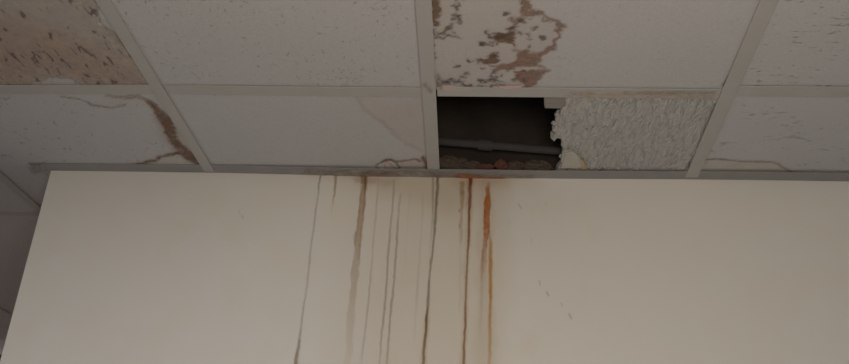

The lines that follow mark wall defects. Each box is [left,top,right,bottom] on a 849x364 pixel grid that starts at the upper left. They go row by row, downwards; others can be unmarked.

water stain [0,0,148,85]
peeling [432,0,461,39]
peeling [437,0,565,91]
water stain [104,95,199,165]